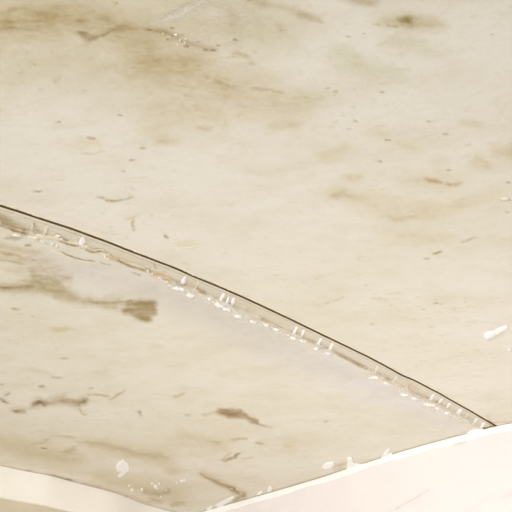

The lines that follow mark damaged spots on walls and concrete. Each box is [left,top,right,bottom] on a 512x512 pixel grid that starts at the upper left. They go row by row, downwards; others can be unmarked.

crack [0,203,497,429]